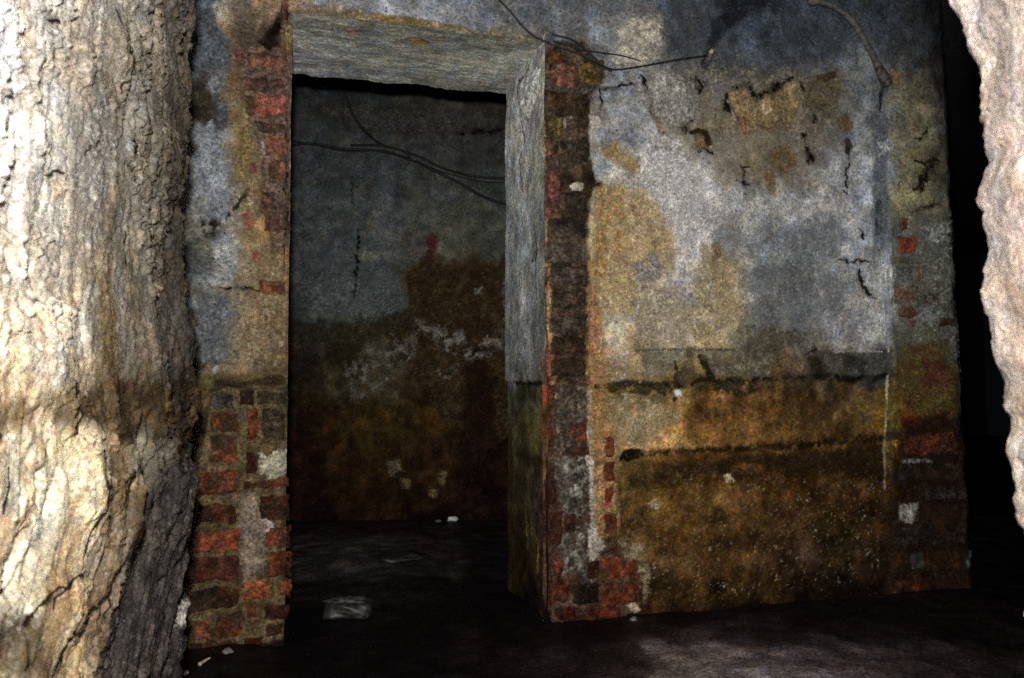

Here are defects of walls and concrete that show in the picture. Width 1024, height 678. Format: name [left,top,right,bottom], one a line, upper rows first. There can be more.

peeling [728,71,840,138]
peeling [763,144,798,196]
crack [843,146,851,194]
crack [911,126,940,216]
crack [350,176,361,298]
crack [839,229,876,299]
flaking render [185,0,292,650]
water stain [288,251,542,482]
flaking render [533,15,734,622]
water stain [586,209,898,560]
water stain [387,460,411,488]
water stain [618,540,667,612]